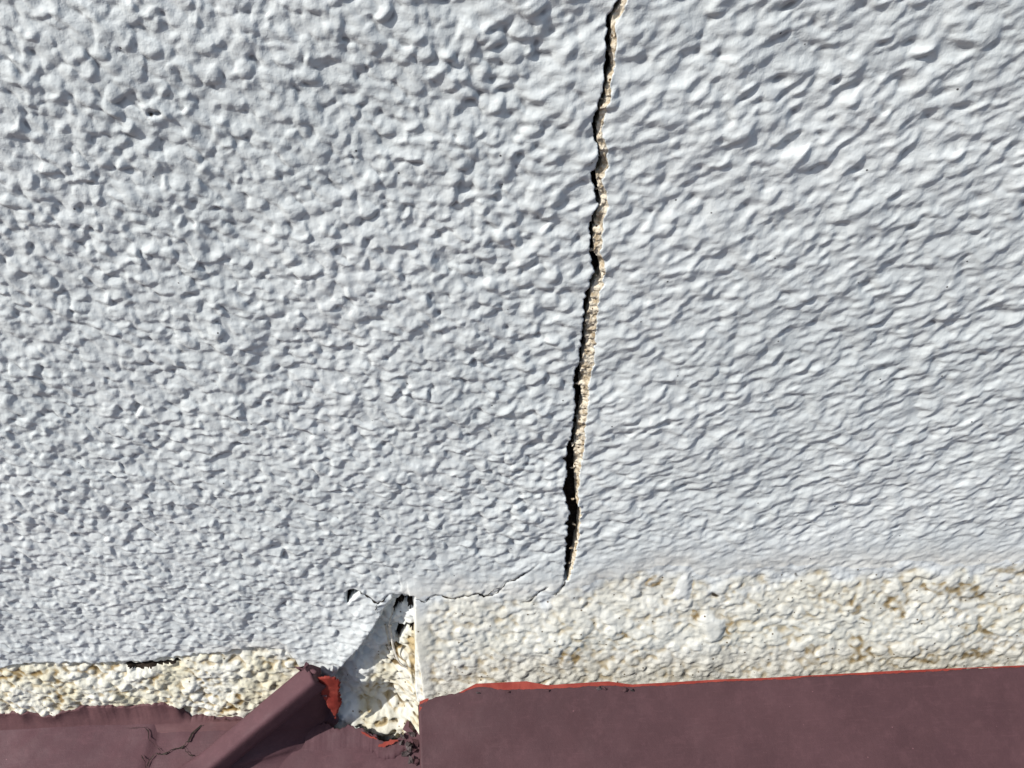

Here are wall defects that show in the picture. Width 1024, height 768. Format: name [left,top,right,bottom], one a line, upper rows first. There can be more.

crack [416,0,627,603]
spalling [317,593,429,747]